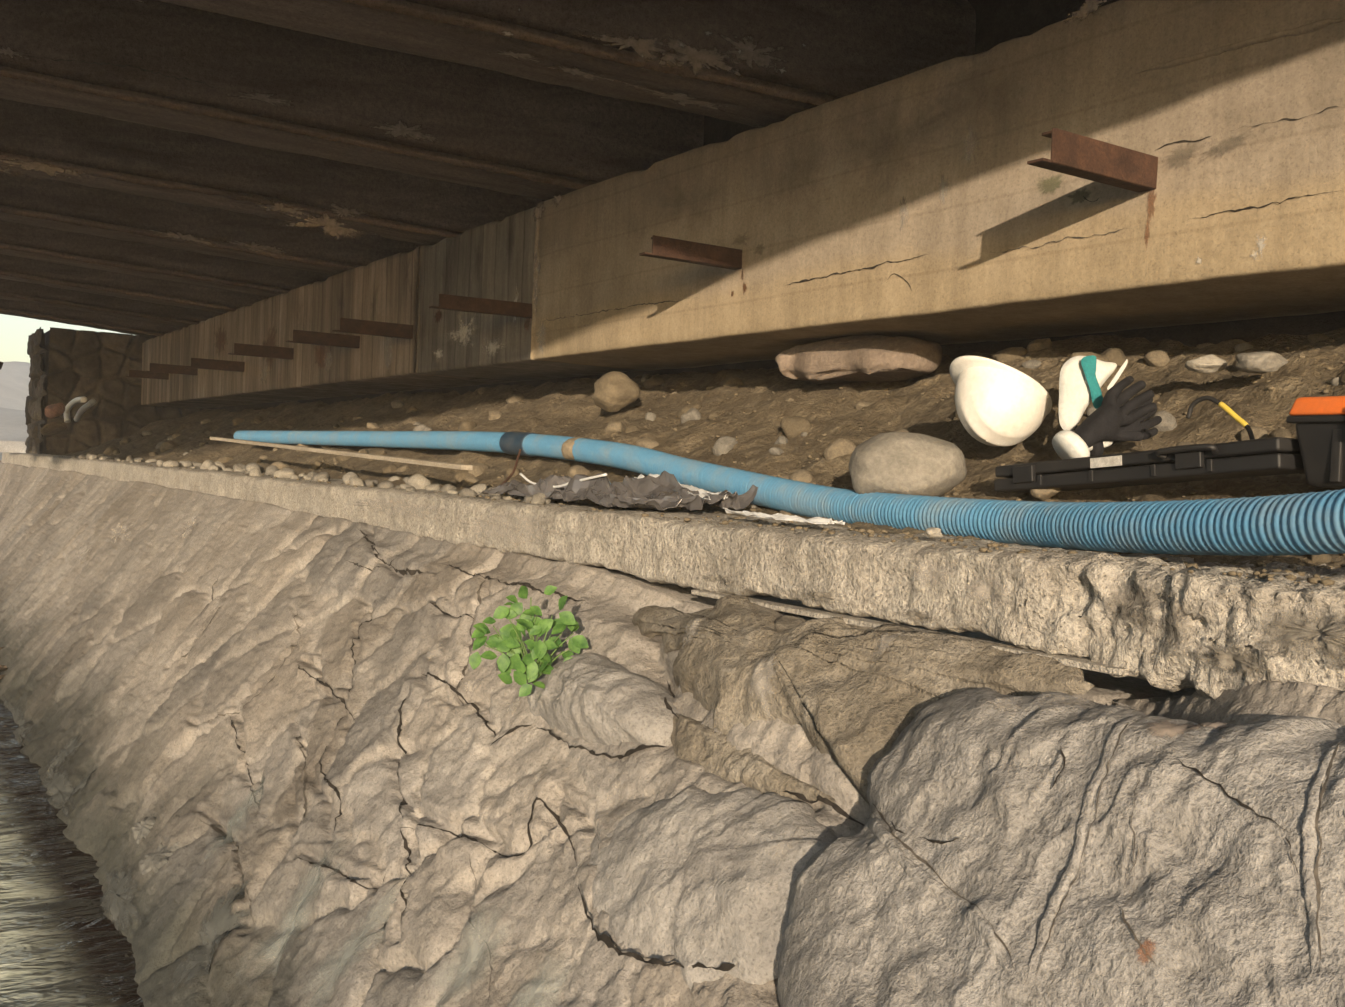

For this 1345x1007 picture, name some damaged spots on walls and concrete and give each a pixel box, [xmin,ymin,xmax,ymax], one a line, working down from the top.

spalling [1064,0,1110,22]
spalling [568,29,787,76]
crack [1154,106,1338,151]
spalling [0,157,86,178]
corrosion [1145,190,1155,241]
crack [1192,190,1341,219]
crack [988,225,1142,253]
crack [785,254,927,291]
damp [435,318,474,358]
crack [166,579,220,670]
crack [196,529,735,1005]
crack [1178,740,1345,967]